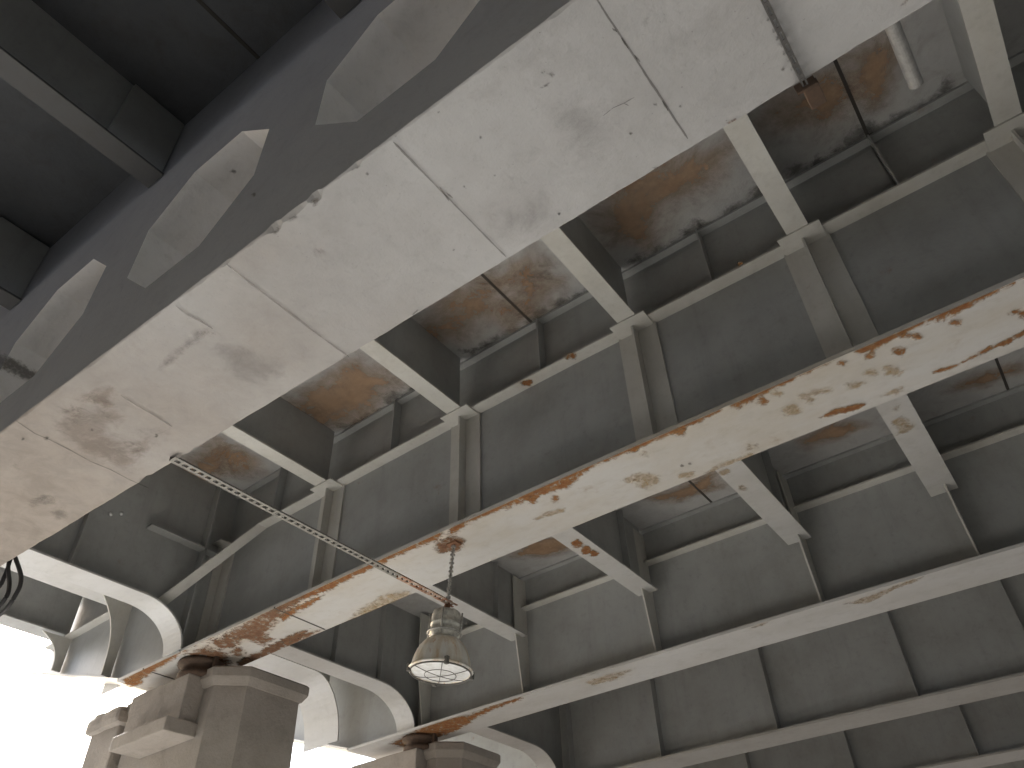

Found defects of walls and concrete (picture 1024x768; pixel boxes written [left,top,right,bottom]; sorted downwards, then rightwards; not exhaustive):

corrosion [606,151,723,243]
corrosion [854,278,1024,359]
corrosion [933,330,1024,372]
corrosion [803,404,865,444]
corrosion [124,361,846,687]
corrosion [390,697,522,748]